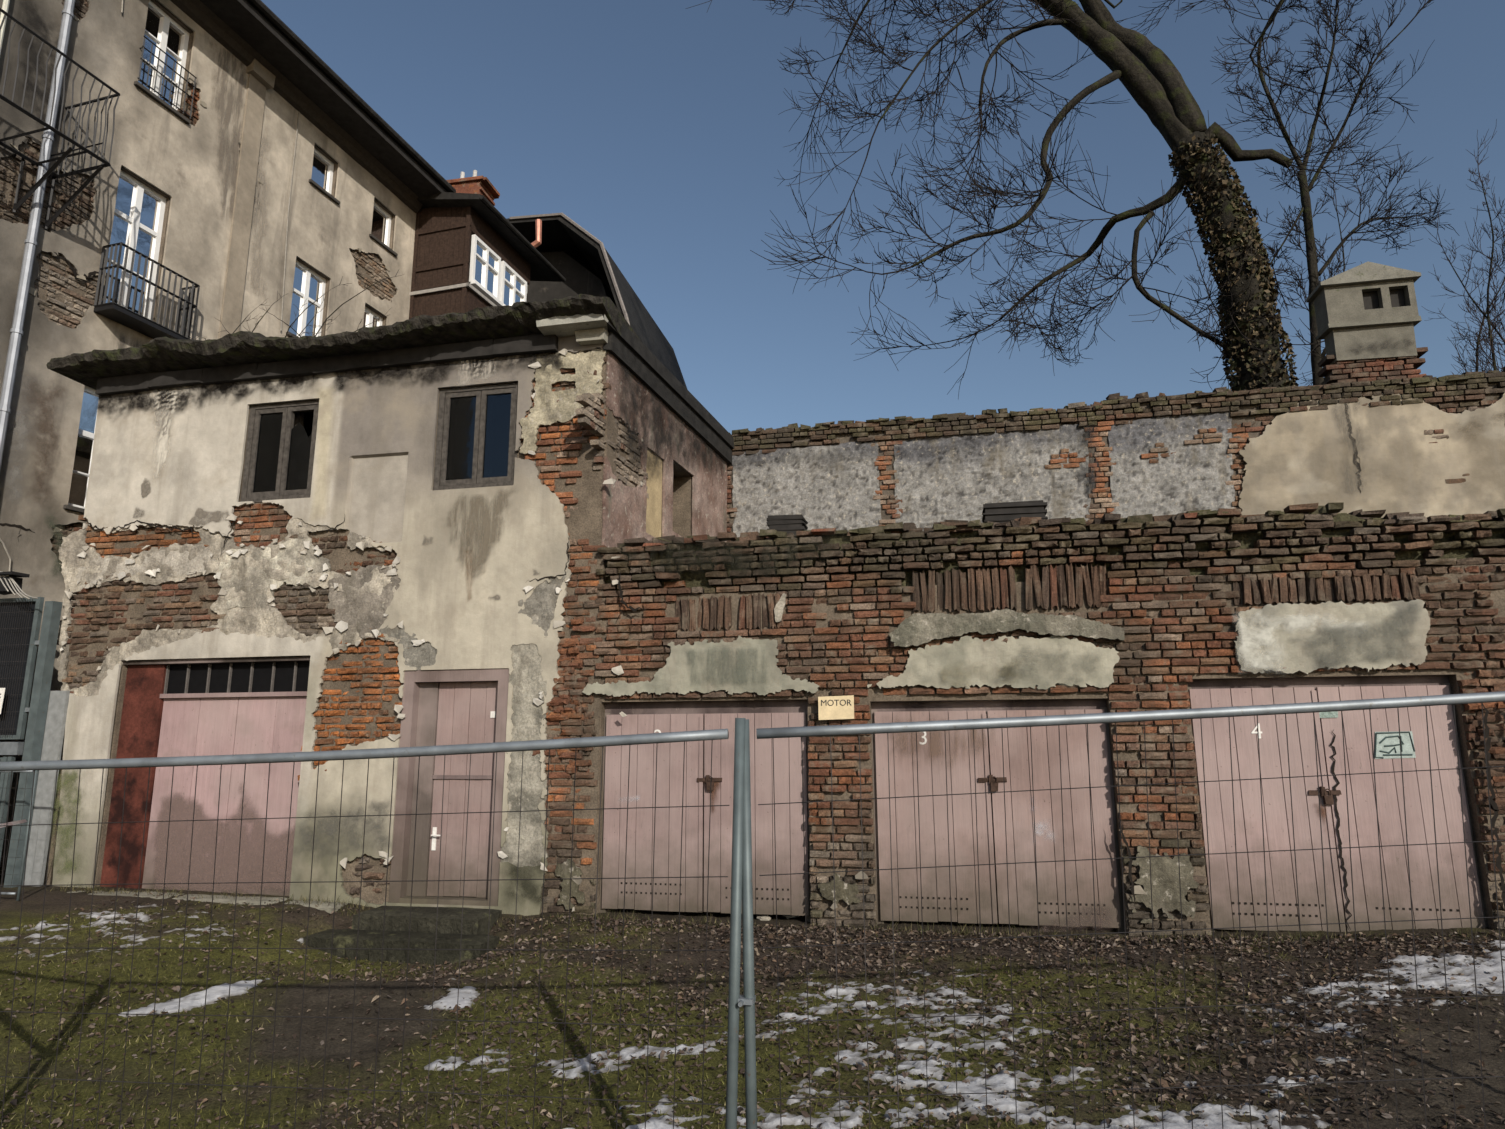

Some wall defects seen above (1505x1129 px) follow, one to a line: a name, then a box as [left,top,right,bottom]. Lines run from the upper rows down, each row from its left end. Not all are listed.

spalling [62,0,88,21]
spalling [0,137,96,232]
spalling [29,251,107,329]
spalling [349,248,396,302]
damp [450,493,507,576]
flaking render [50,480,437,781]
spalling [497,348,649,913]
crack [1330,731,1352,930]
spalling [340,851,393,894]